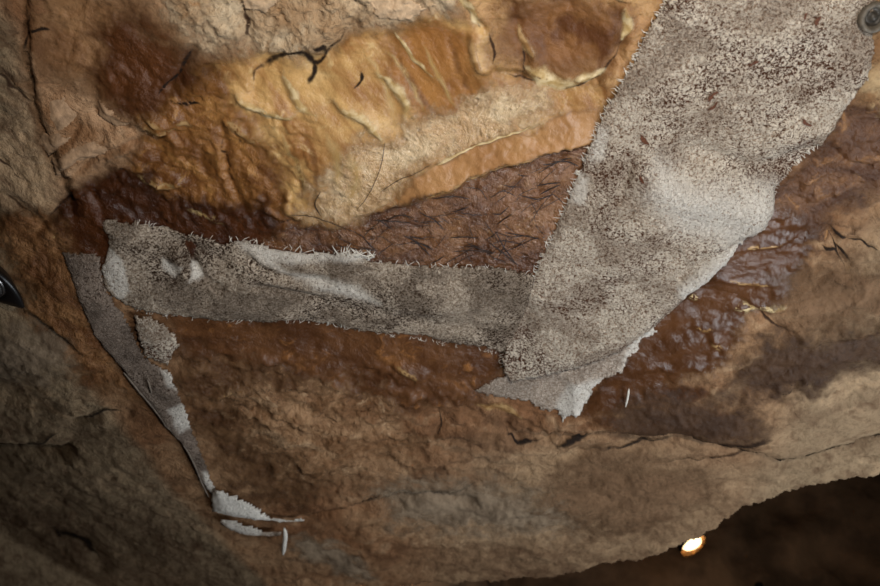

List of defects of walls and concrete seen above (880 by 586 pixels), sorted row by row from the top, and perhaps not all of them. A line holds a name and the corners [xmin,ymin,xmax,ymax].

crack [253,36,343,82]
crack [508,433,669,452]
crack [673,433,880,461]